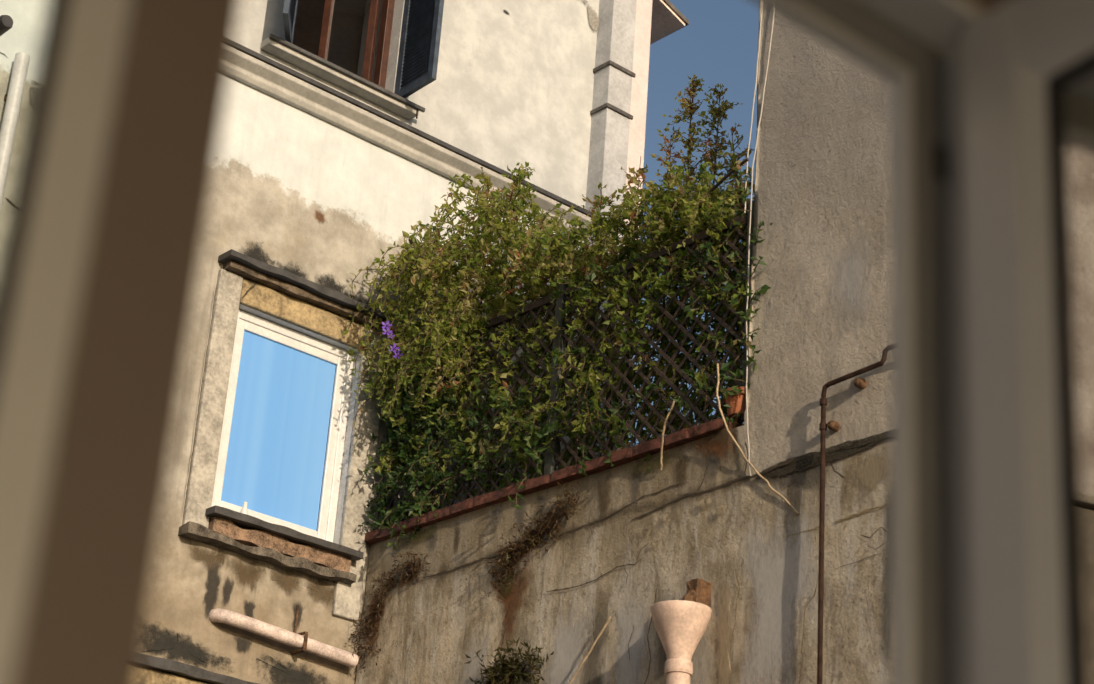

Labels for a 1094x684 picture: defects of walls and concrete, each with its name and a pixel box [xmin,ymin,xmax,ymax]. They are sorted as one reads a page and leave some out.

flaking render [584,0,599,31]
damp [243,245,306,279]
damp [318,275,372,304]
damp [598,478,609,520]
crack [535,442,753,547]
damp [192,547,335,617]
crack [416,551,506,582]
crack [547,543,649,592]
damp [293,603,302,628]
damp [143,624,229,667]
damp [236,637,252,651]
damp [263,656,326,684]